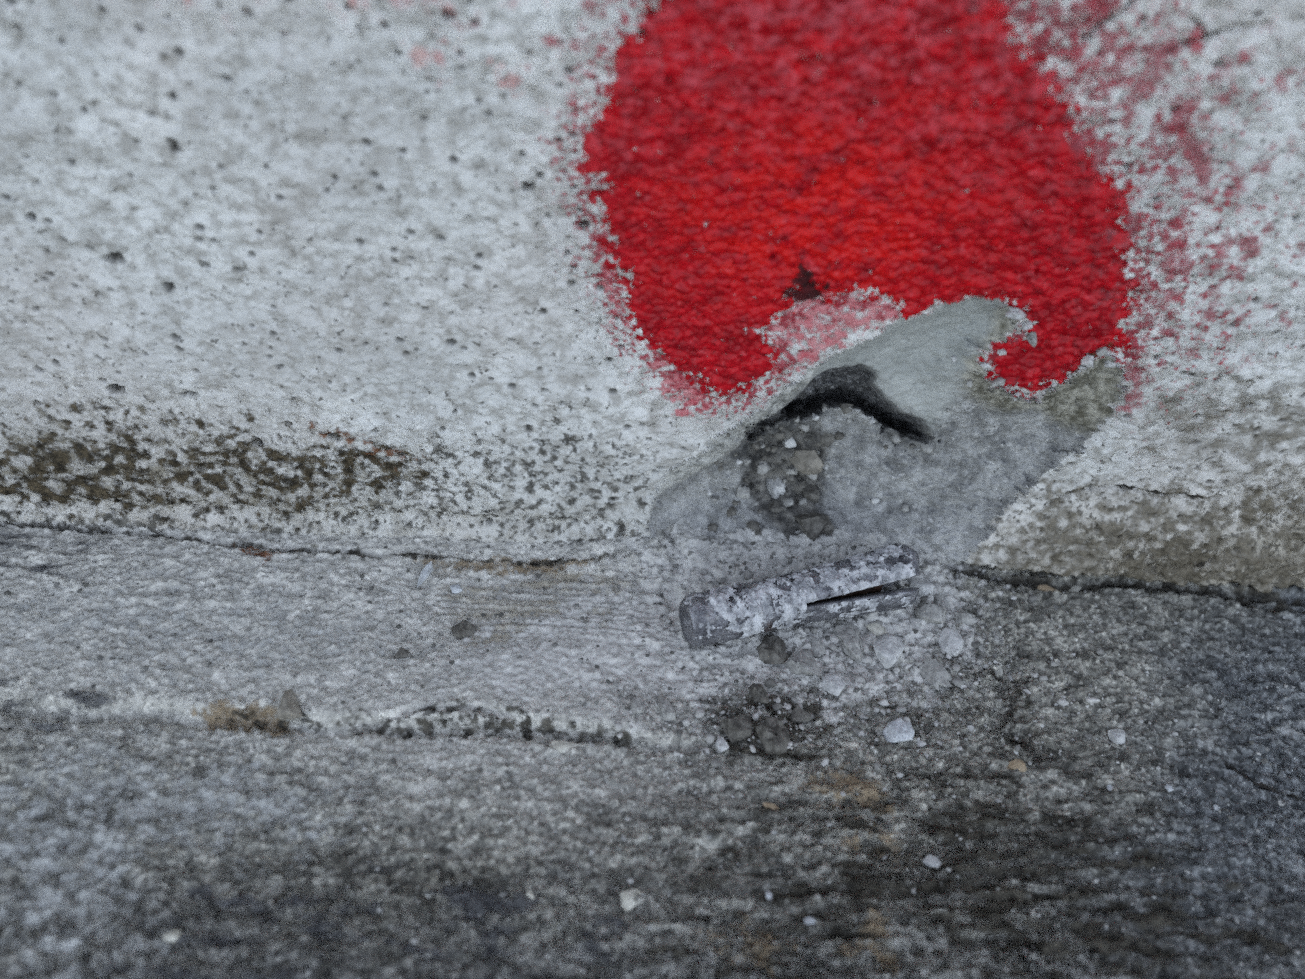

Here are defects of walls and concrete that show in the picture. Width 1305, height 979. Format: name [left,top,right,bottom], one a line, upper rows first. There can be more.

crack [1188,17,1266,41]
spalling [647,296,1126,565]
crack [1069,484,1205,499]
crack [947,545,1305,615]